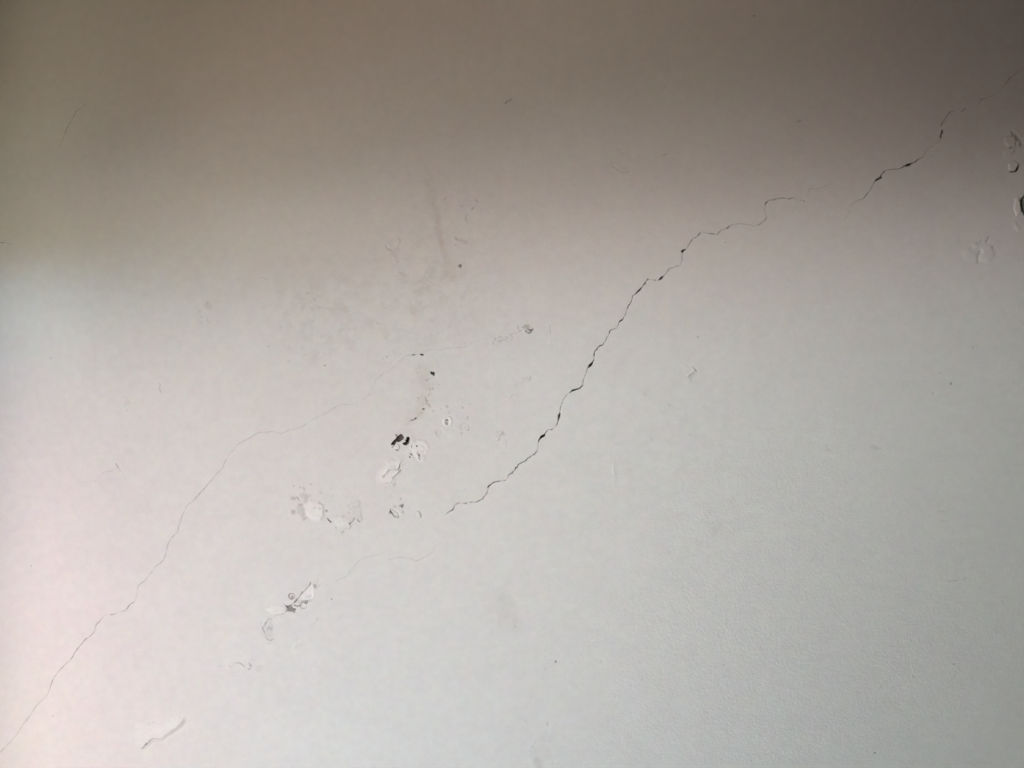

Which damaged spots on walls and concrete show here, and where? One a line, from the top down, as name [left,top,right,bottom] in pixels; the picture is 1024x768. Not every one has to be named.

crack [842,67,1024,222]
crack [443,179,838,517]
crack [0,337,489,753]
spalling [258,579,321,645]
spalling [287,482,364,534]
spalling [387,431,431,463]